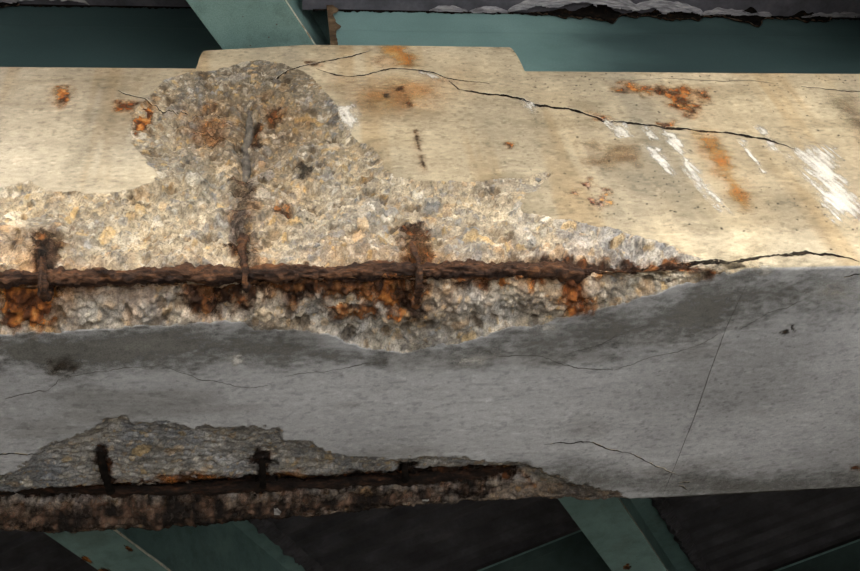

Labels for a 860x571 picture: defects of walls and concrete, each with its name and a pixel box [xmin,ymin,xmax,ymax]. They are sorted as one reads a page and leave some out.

crack [271,51,793,149]
spalling [0,60,746,353]
damp [591,121,637,166]
damp [641,127,721,206]
damp [794,147,860,221]
corrosion [31,228,66,272]
corrosion [141,272,543,323]
corrosion [539,255,717,316]
crack [668,250,859,278]
corrosion [0,464,536,534]
spalling [0,415,628,531]
crack [545,441,688,490]